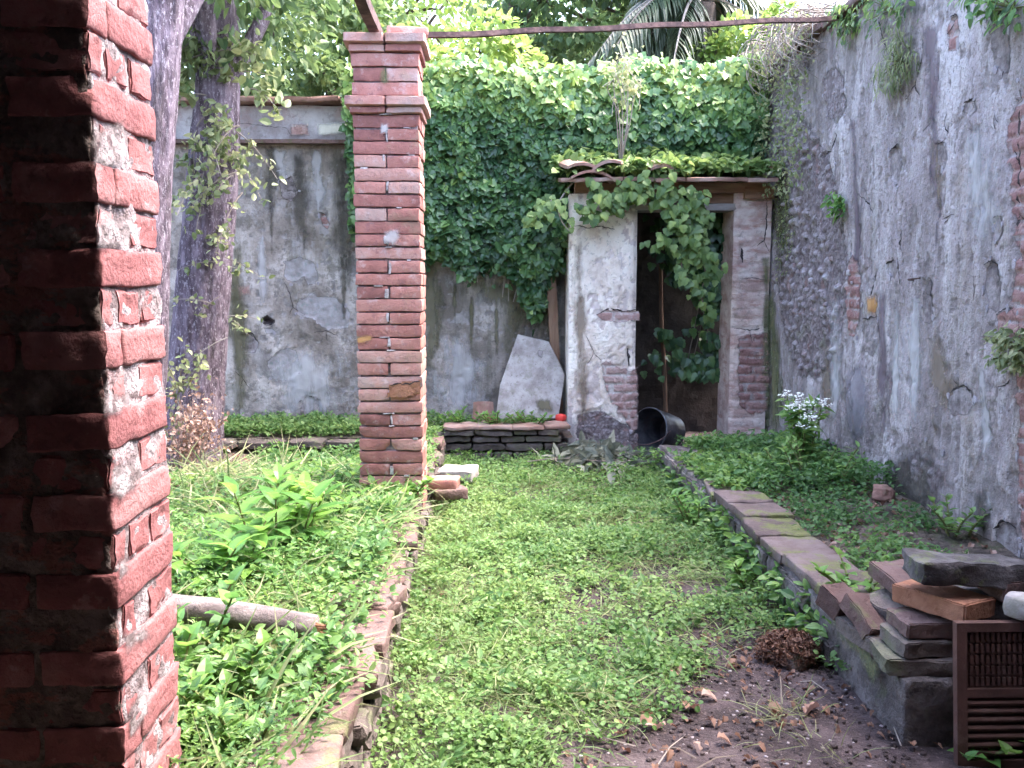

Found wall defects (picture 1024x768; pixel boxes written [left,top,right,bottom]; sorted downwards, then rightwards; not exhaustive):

water stain [228,248,249,408]
water stain [258,146,325,302]
water stain [280,354,330,410]
water stain [334,158,351,318]
spalling [574,354,638,450]
spalling [596,306,640,324]
spalling [735,326,770,414]
spalling [772,51,880,391]
spalling [981,10,1024,558]